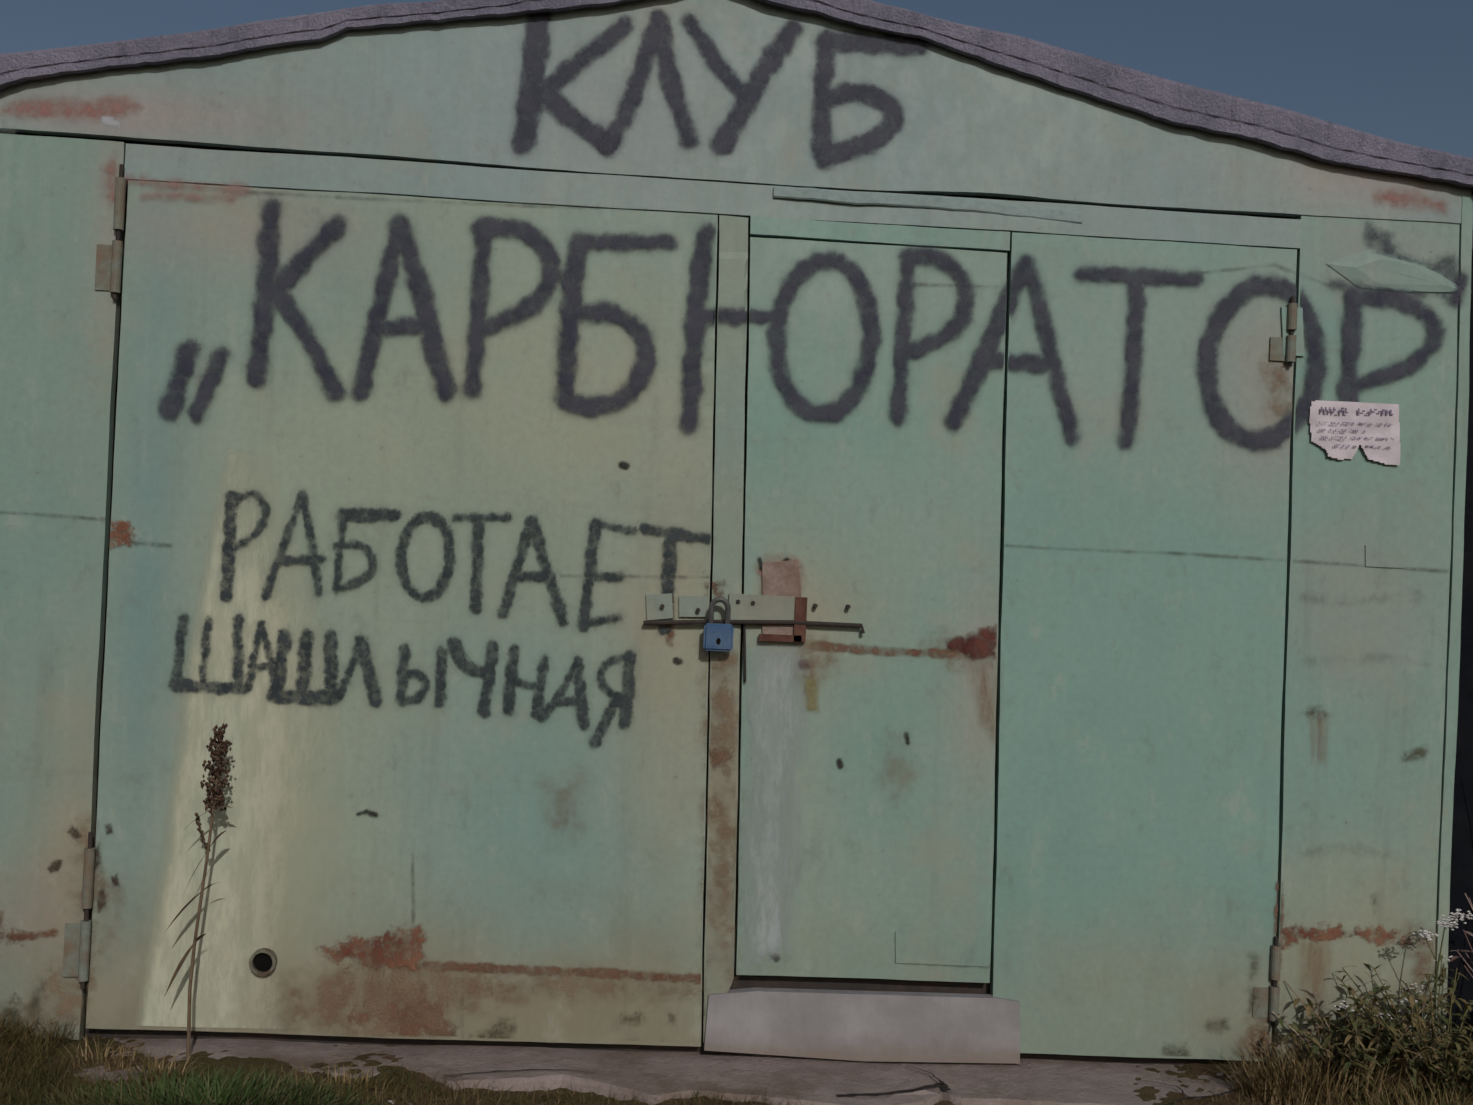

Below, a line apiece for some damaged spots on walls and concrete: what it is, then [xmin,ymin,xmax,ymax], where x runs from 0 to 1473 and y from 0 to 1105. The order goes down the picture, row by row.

corrosion [9,100,135,126]
corrosion [109,521,135,547]
corrosion [799,626,997,710]
corrosion [0,915,57,941]
corrosion [320,925,701,984]
corrosion [1274,883,1433,985]